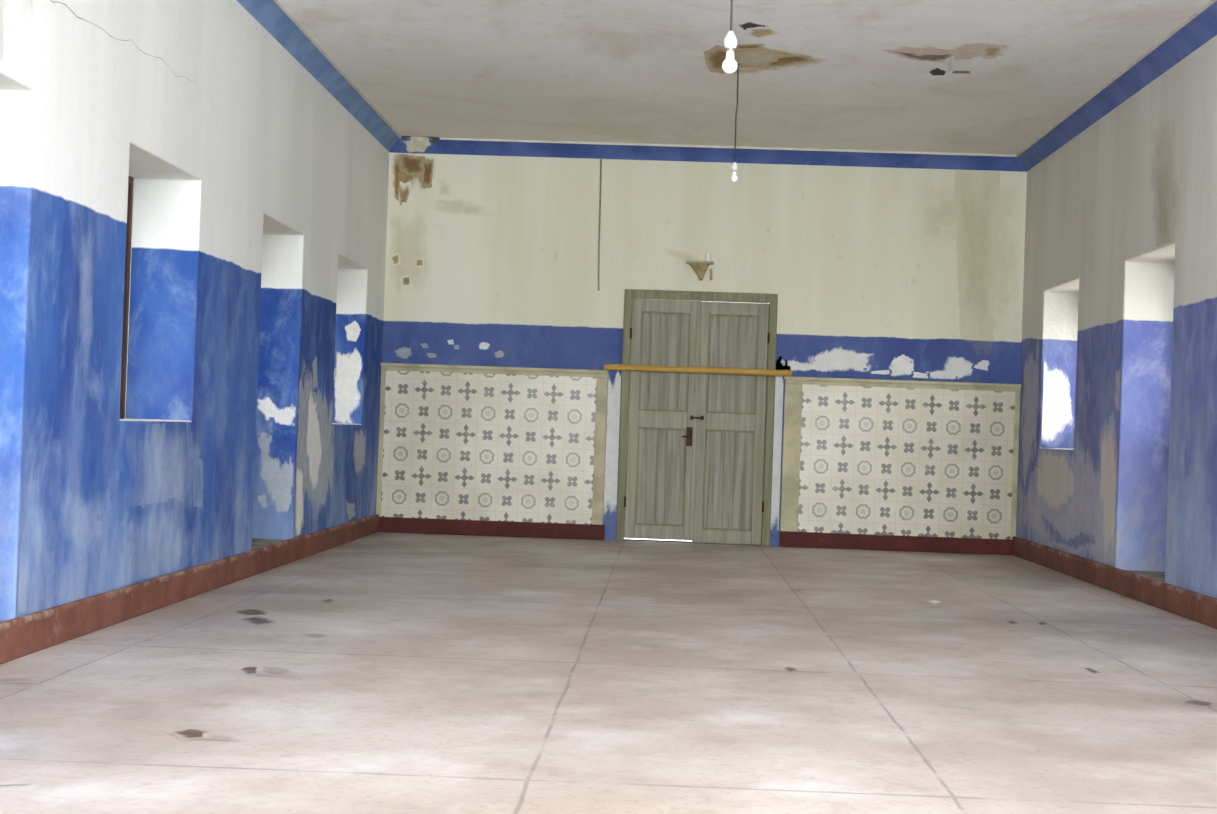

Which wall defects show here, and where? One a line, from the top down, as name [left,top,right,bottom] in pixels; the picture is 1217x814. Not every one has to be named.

crack [50,0,194,82]
leakage [689,40,838,78]
peeling [392,339,460,360]
peeling [477,341,507,358]
peeling [254,318,368,536]
peeling [770,344,991,530]